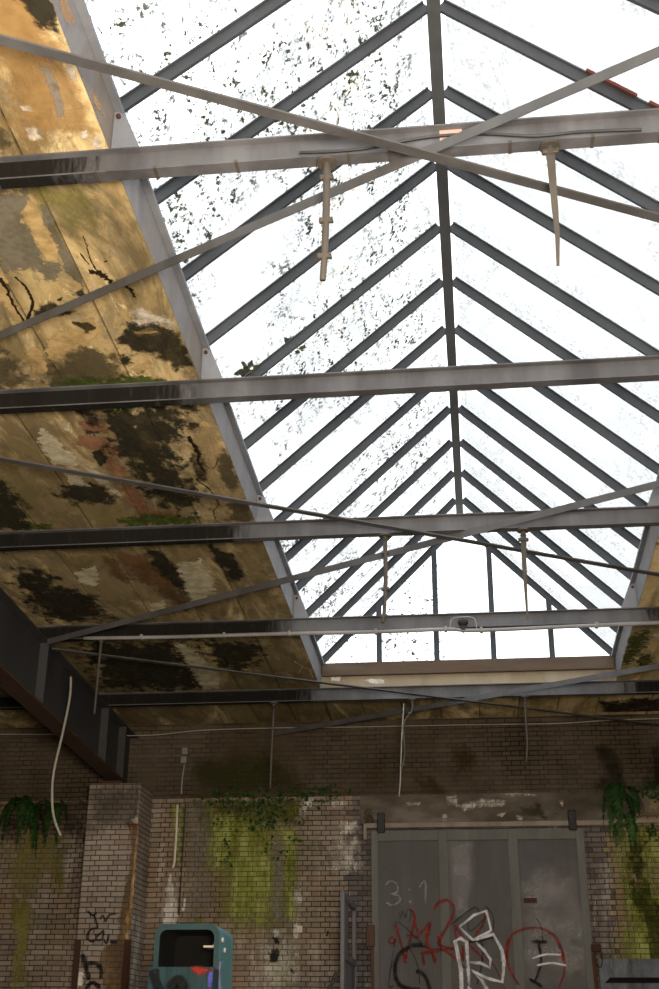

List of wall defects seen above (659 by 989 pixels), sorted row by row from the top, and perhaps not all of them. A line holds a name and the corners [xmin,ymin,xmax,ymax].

leakage [0,0,103,148]
crack [80,236,136,298]
leakage [0,480,31,532]
peeling [35,422,122,496]
leakage [52,482,118,506]
leakage [75,404,252,522]